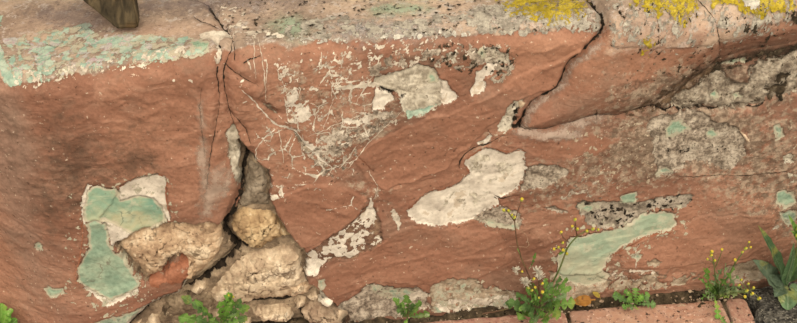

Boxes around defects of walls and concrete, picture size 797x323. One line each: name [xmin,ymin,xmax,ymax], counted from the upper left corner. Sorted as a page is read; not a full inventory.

peeling [0,22,209,89]
spalling [44,123,517,323]
crack [185,0,403,285]
peeling [274,38,518,182]
peeling [390,50,797,300]
crack [519,0,765,130]
crack [243,295,304,317]